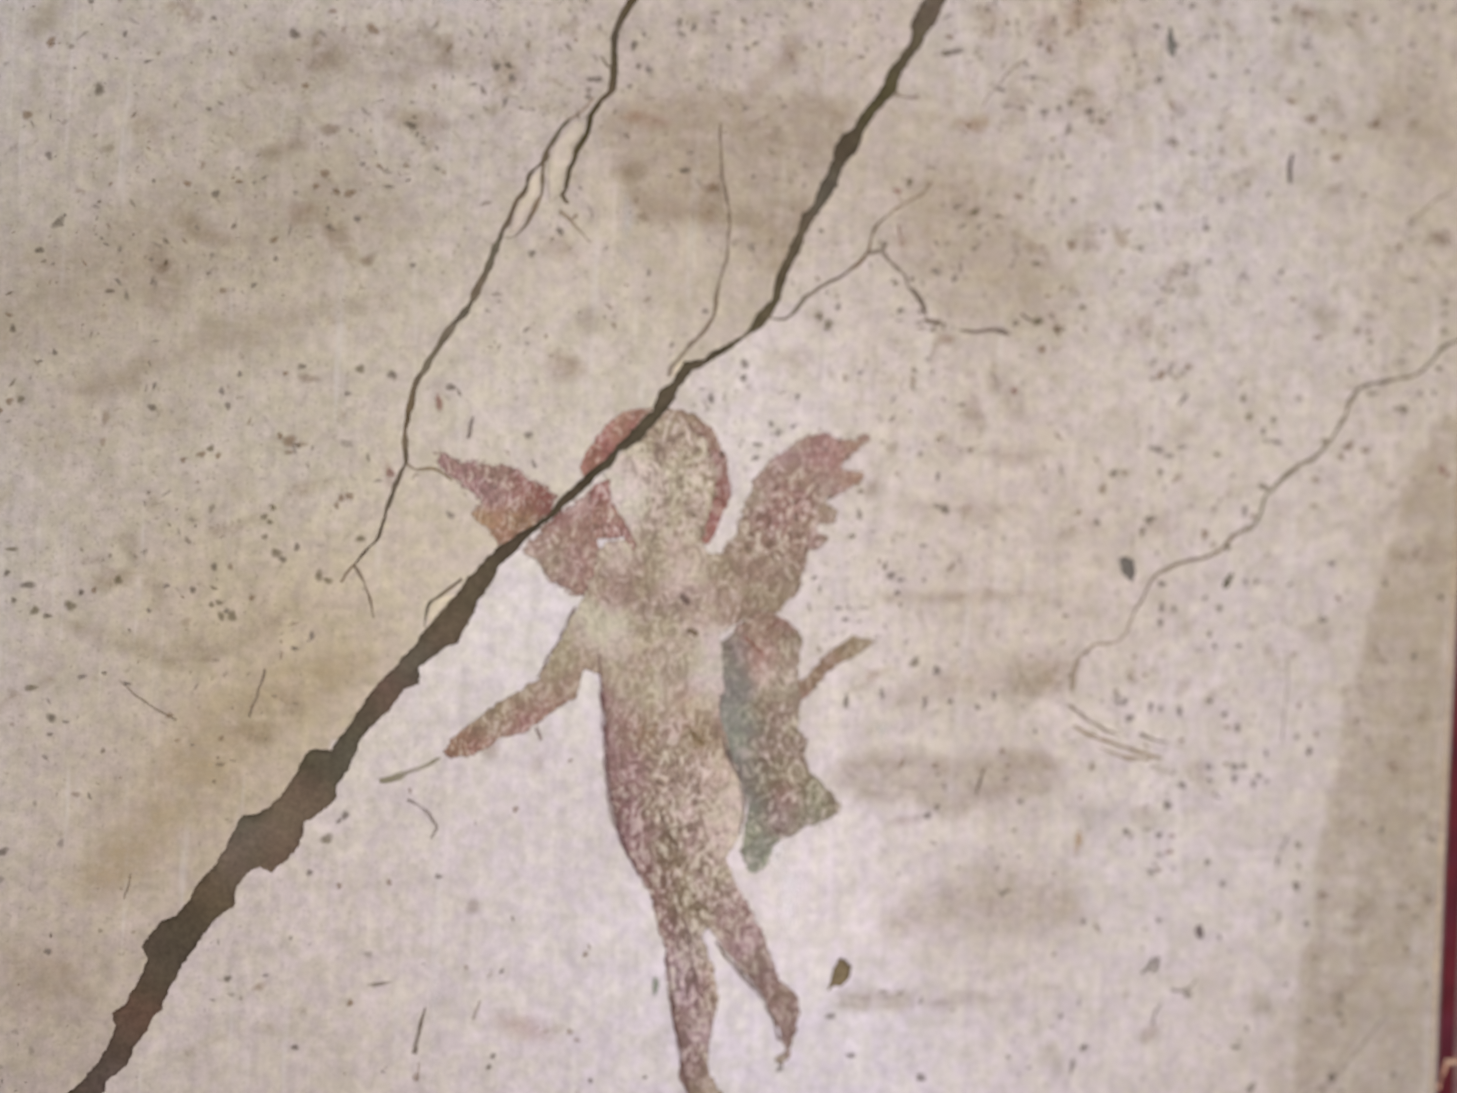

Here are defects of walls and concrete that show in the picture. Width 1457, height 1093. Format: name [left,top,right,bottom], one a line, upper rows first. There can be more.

crack [68,0,1032,1093]
crack [1071,340,1457,691]